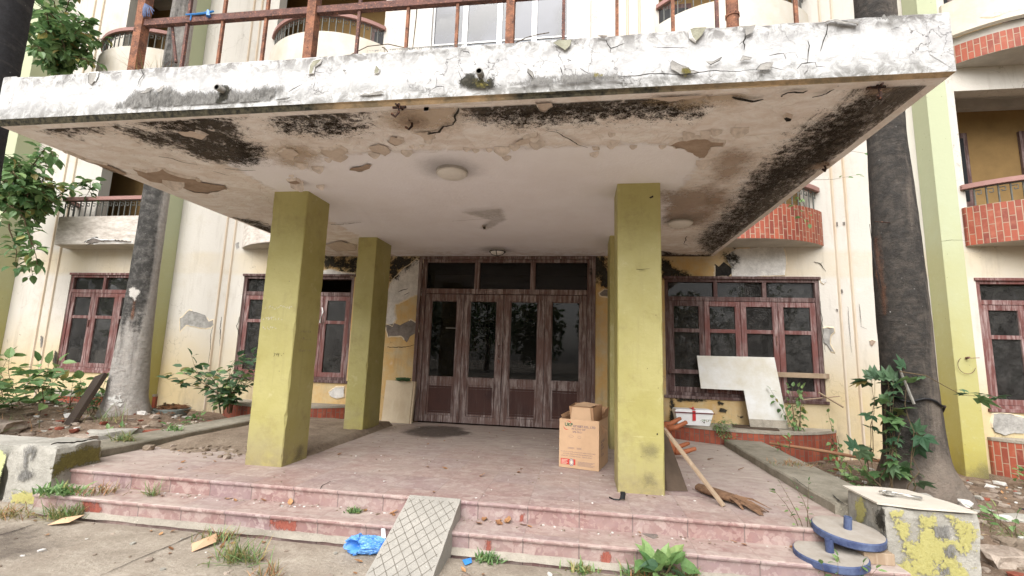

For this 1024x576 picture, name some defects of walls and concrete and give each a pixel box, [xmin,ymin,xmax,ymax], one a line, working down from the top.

peeling [62,150,227,194]
mould [36,112,380,167]
peeling [286,136,424,192]
crack [428,44,472,135]
mould [453,94,722,133]
peeling [659,127,749,216]
crack [622,24,835,103]
leakage [661,84,926,277]
flaking render [179,309,214,332]
flaking render [385,258,424,342]
flaking render [990,412,1024,436]